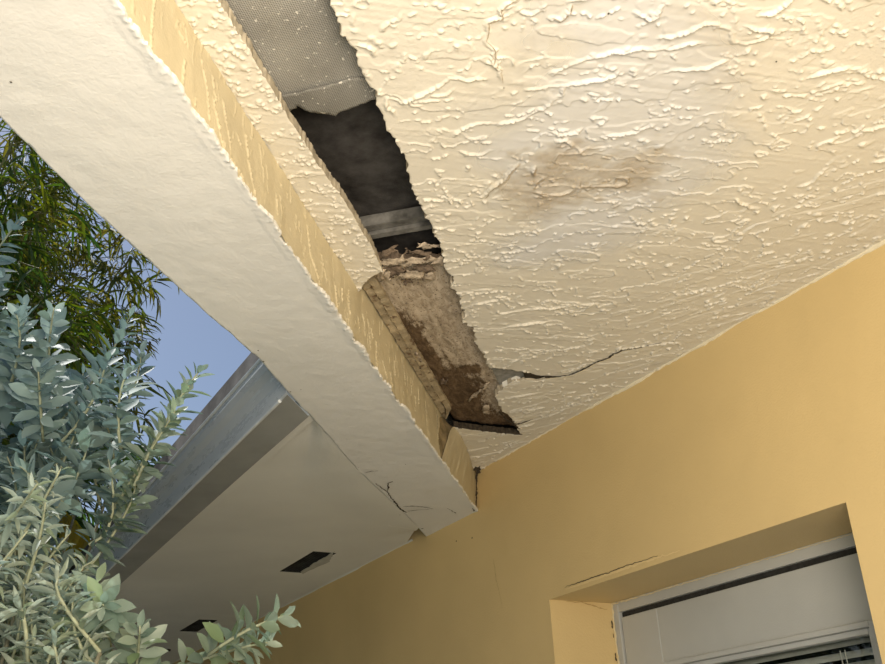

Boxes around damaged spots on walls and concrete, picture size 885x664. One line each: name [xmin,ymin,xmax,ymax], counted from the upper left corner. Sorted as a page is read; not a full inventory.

crack [486,0,517,80]
peeling [373,242,444,286]
crack [522,343,659,379]
peeling [467,382,490,415]
crack [366,471,478,512]